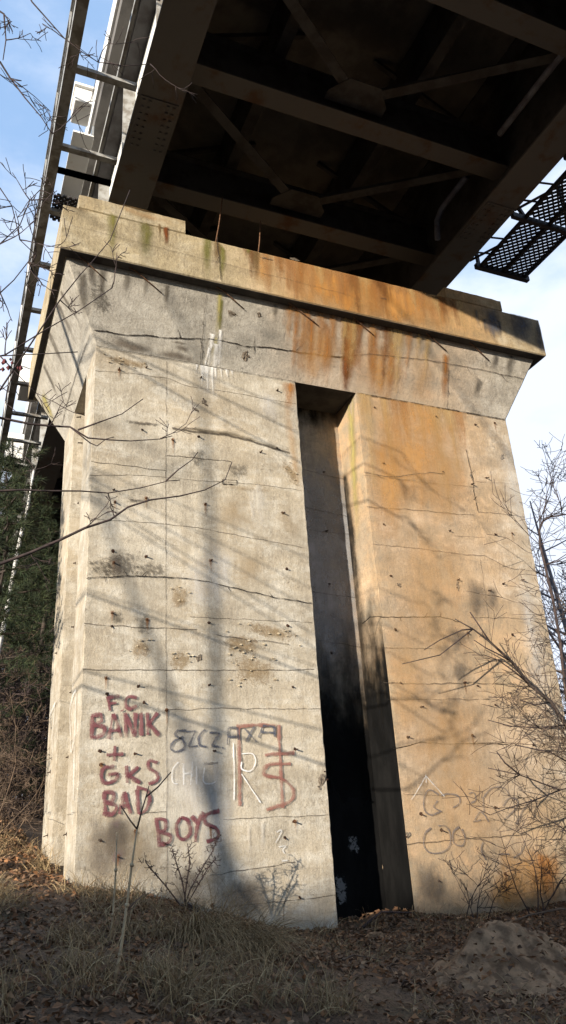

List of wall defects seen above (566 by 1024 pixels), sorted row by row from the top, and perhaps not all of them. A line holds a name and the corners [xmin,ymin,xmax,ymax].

leakage [117,340,144,351]
leakage [164,294,232,388]
crack [62,237,523,423]
corrosion [245,249,463,454]